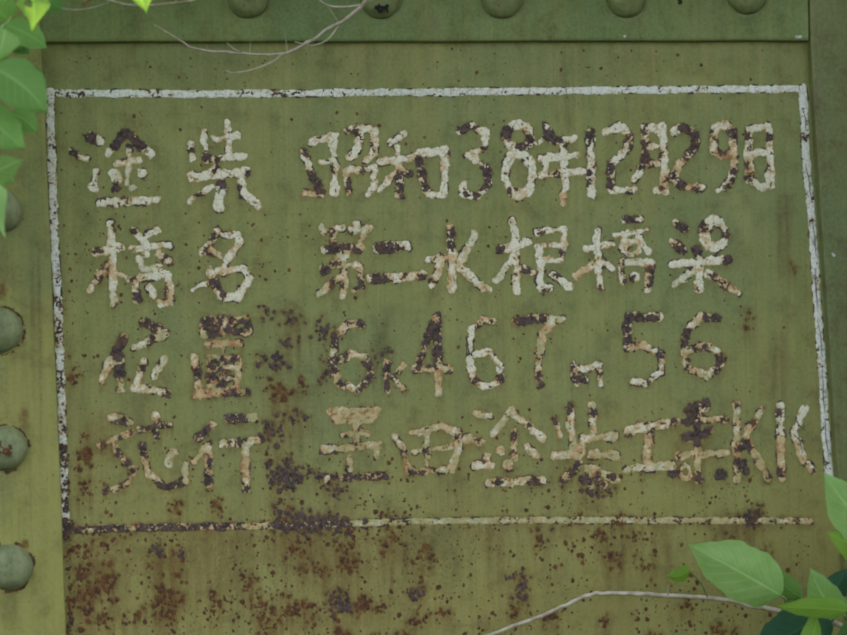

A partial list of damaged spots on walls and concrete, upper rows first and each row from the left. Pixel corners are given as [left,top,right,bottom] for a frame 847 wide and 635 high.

peeling [187,147,252,201]
peeling [49,202,66,394]
peeling [91,246,109,285]
peeling [129,276,155,304]
peeling [198,225,254,304]
peeling [100,334,136,391]
peeling [138,317,171,347]
peeling [138,358,172,399]
peeling [191,314,254,400]
peeling [57,403,353,537]
peeling [323,463,389,483]
corrosion [57,300,778,635]